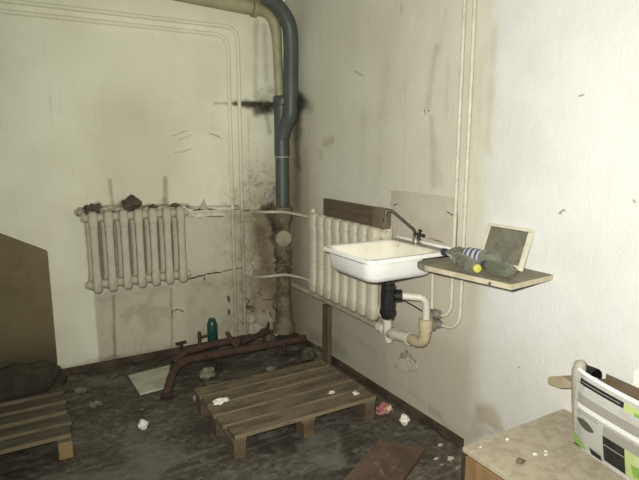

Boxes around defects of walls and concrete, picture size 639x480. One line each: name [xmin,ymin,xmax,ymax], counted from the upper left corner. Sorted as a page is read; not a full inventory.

damp [296,93,305,121]
damp [262,204,276,240]
crack [180,268,242,283]
peeling [246,310,277,336]